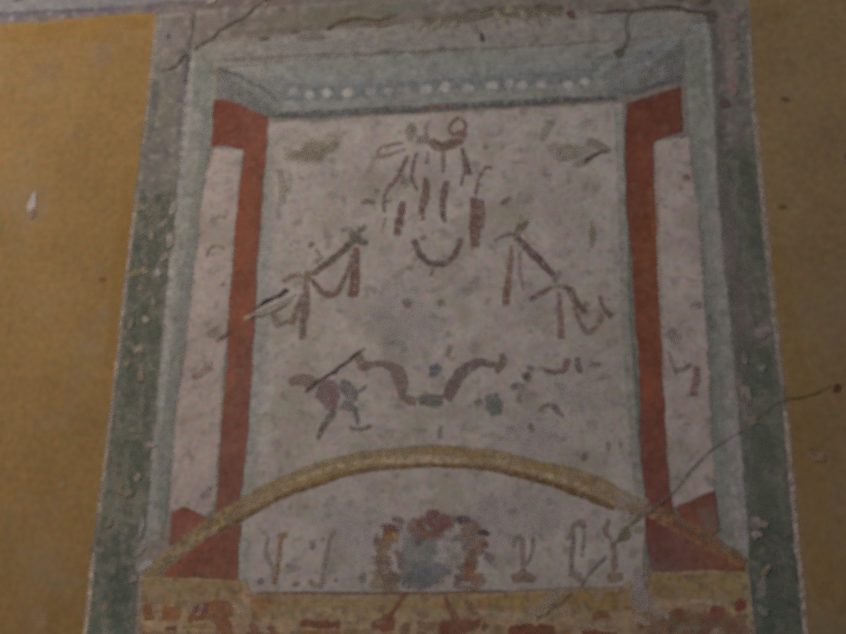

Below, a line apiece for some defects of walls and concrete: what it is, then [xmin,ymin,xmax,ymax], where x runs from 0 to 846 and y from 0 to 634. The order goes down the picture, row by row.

crack [161,0,285,84]
crack [612,8,634,58]
crack [518,384,831,623]